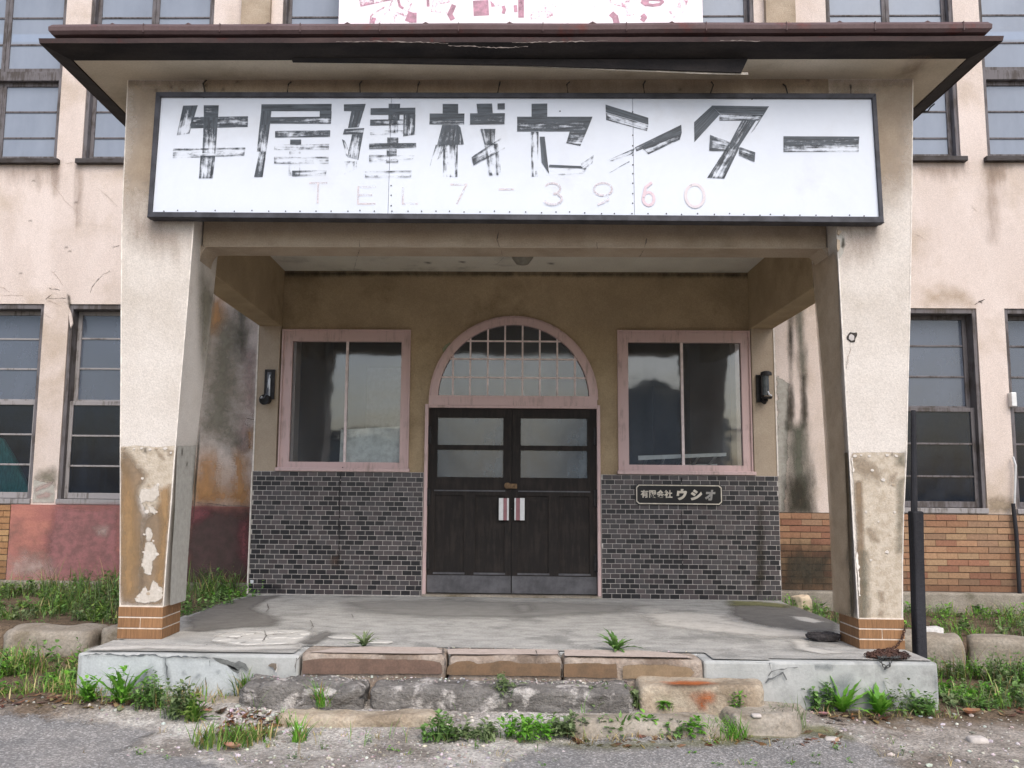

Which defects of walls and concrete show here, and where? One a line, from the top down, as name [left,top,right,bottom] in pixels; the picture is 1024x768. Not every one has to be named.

peeling [121,445,196,605]
water stain [187,277,252,582]
water stain [349,252,867,668]
corrosion [667,681,713,709]